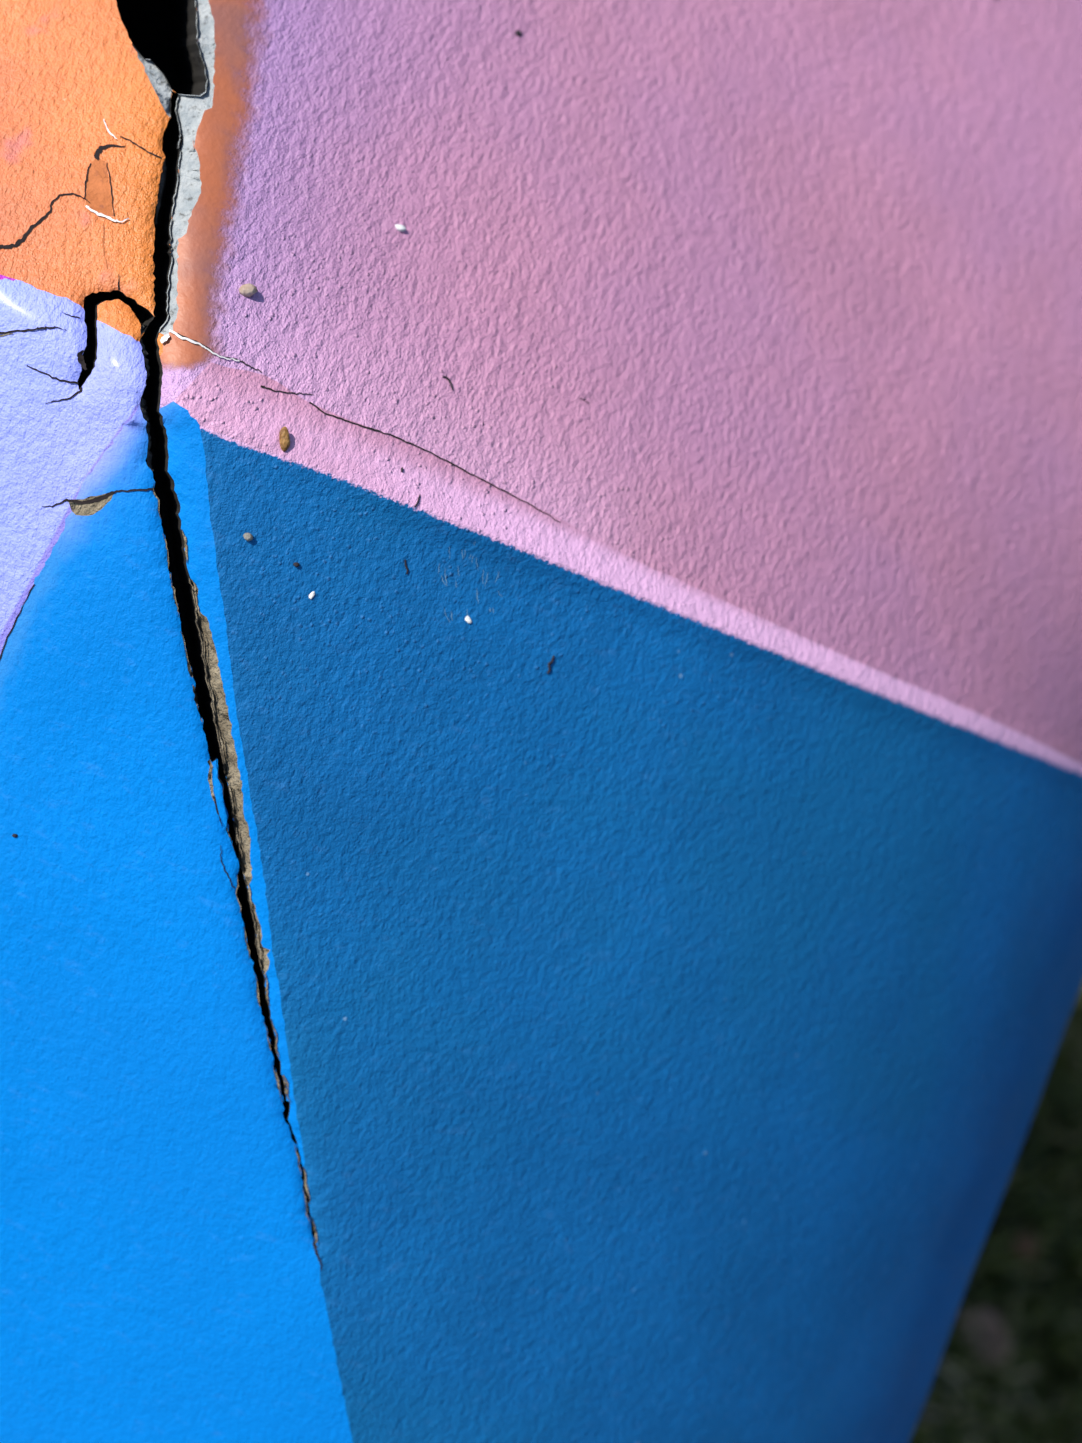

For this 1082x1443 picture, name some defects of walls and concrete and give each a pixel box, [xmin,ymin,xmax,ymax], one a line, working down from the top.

peeling [132,44,172,118]
crack [0,0,561,1269]